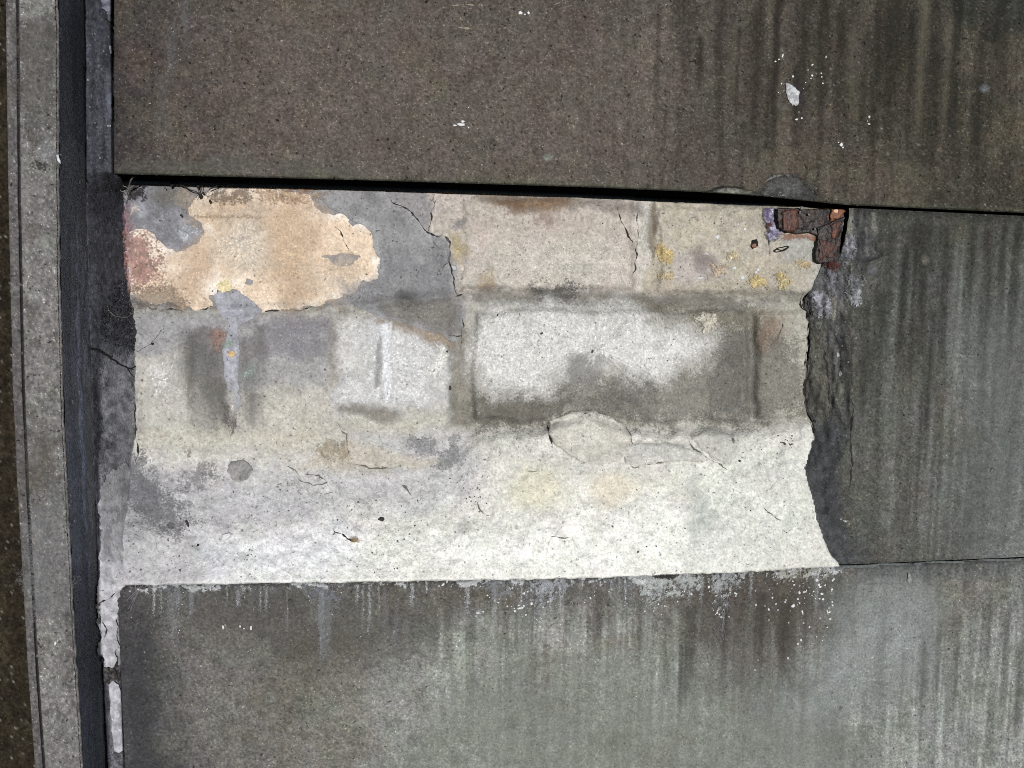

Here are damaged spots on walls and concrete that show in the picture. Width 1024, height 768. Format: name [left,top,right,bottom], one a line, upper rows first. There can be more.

flaking render [104,187,380,340]
crack [388,196,464,343]
crack [617,207,639,283]
spalling [705,173,846,258]
efflorescence [810,233,877,322]
spalling [548,407,741,469]
spalling [805,318,853,563]
leakage [130,584,252,643]
leakage [265,567,842,657]
leakage [767,585,930,728]